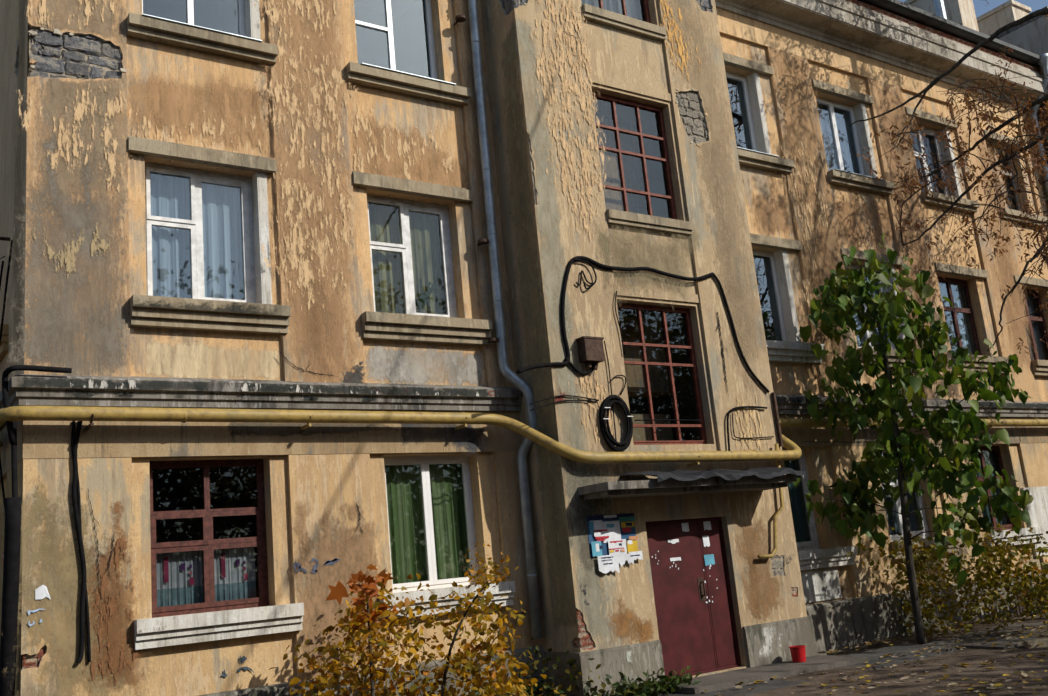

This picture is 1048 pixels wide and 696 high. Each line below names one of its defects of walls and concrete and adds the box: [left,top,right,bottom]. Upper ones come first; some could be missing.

spalling [14,0,453,311]
peeling [502,0,610,241]
spalling [660,0,708,147]
spalling [696,0,712,12]
damp [18,485,150,696]
spalling [573,609,595,650]